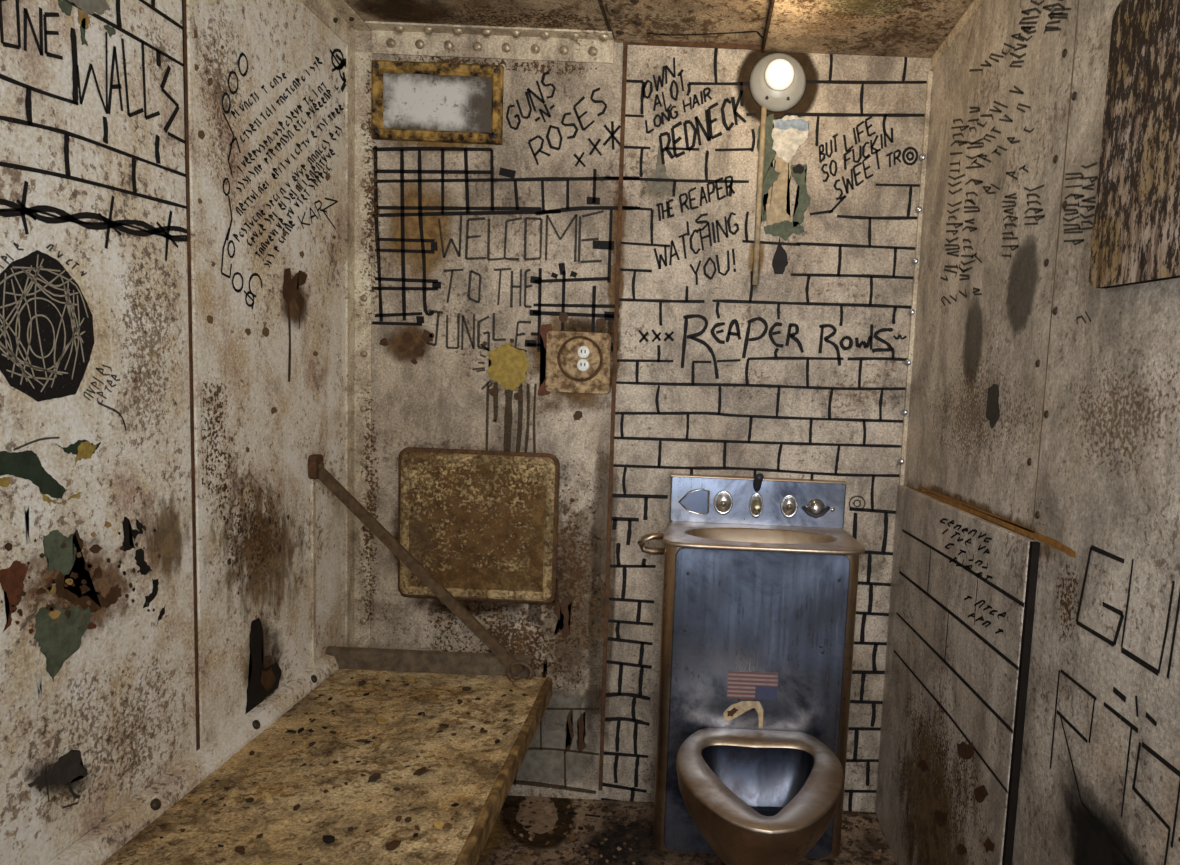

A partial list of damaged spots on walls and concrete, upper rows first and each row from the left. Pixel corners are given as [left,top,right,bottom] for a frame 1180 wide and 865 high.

peeling [756,114,811,241]
peeling [0,437,101,504]
peeling [0,505,165,698]
corrosion [360,385,379,628]
corrosion [394,443,617,753]